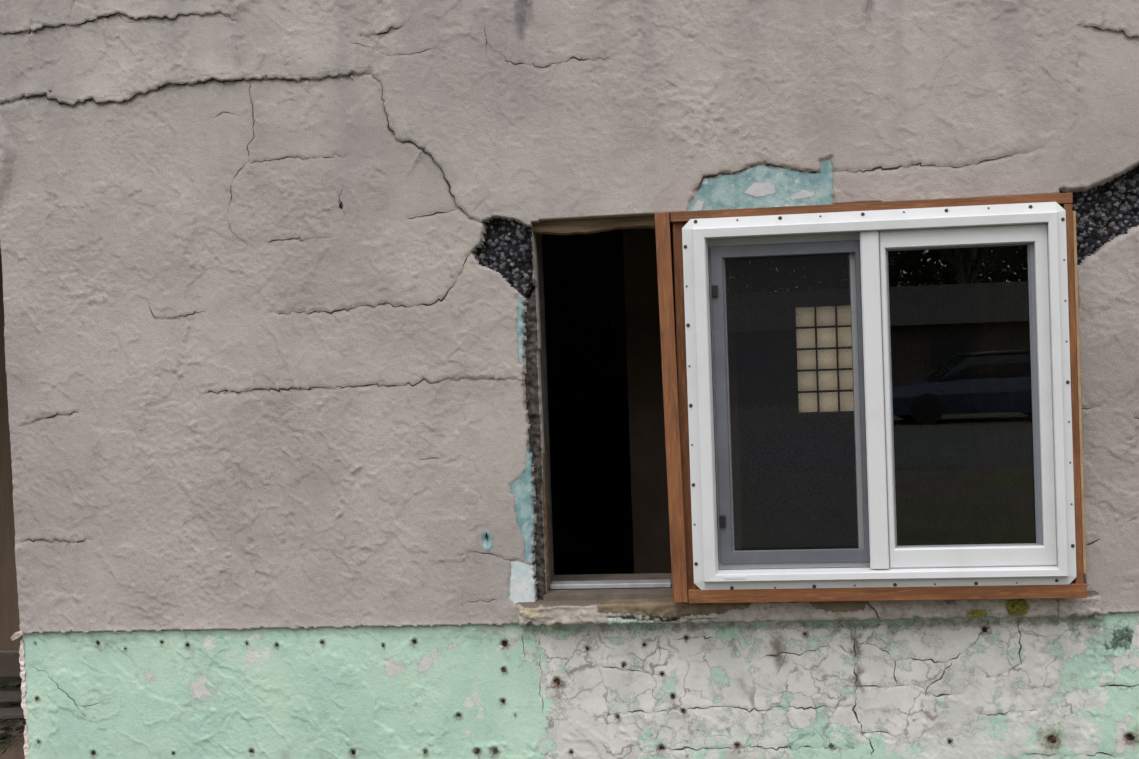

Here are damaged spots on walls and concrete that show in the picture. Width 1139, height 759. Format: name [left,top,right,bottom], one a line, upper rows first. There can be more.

crack [2,12,238,35]
crack [1077,24,1138,38]
crack [1,25,487,242]
peeling [688,159,833,211]
spalling [1060,165,1139,265]
crack [275,251,479,314]
crack [208,377,524,394]
peeling [473,217,1106,759]
crack [998,620,1022,676]
peeling [1105,619,1139,674]
crack [590,601,983,753]
peeling [1109,715,1135,759]